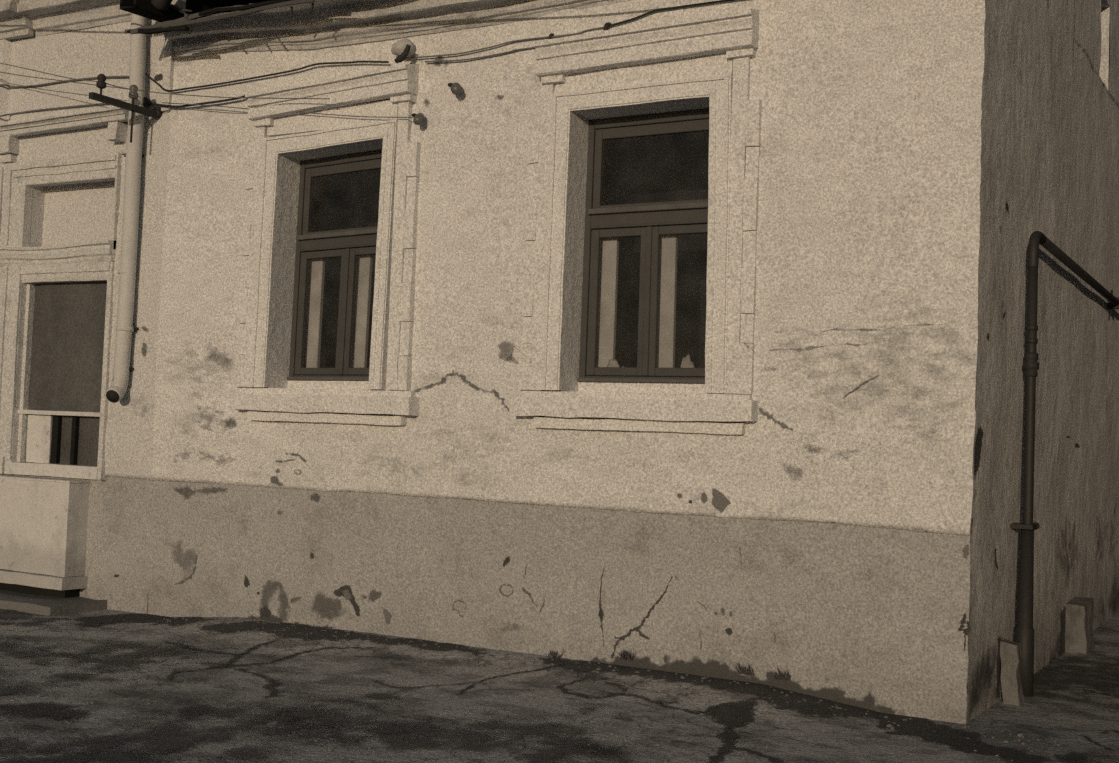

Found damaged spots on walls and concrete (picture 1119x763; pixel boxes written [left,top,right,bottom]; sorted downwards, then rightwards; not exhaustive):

crack [798,328,875,351]
crack [415,371,509,411]
crack [843,375,879,398]
crack [759,408,793,430]
flaking render [974,426,983,476]
flaking render [677,486,735,518]
flaking render [332,582,396,629]
crack [167,567,783,763]